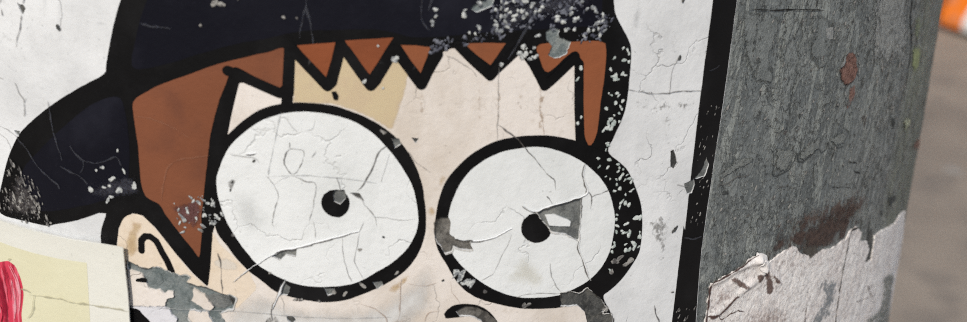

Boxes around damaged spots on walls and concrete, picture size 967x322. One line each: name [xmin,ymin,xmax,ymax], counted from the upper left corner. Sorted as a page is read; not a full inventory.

corrosion [840,50,861,108]
corrosion [768,197,865,260]